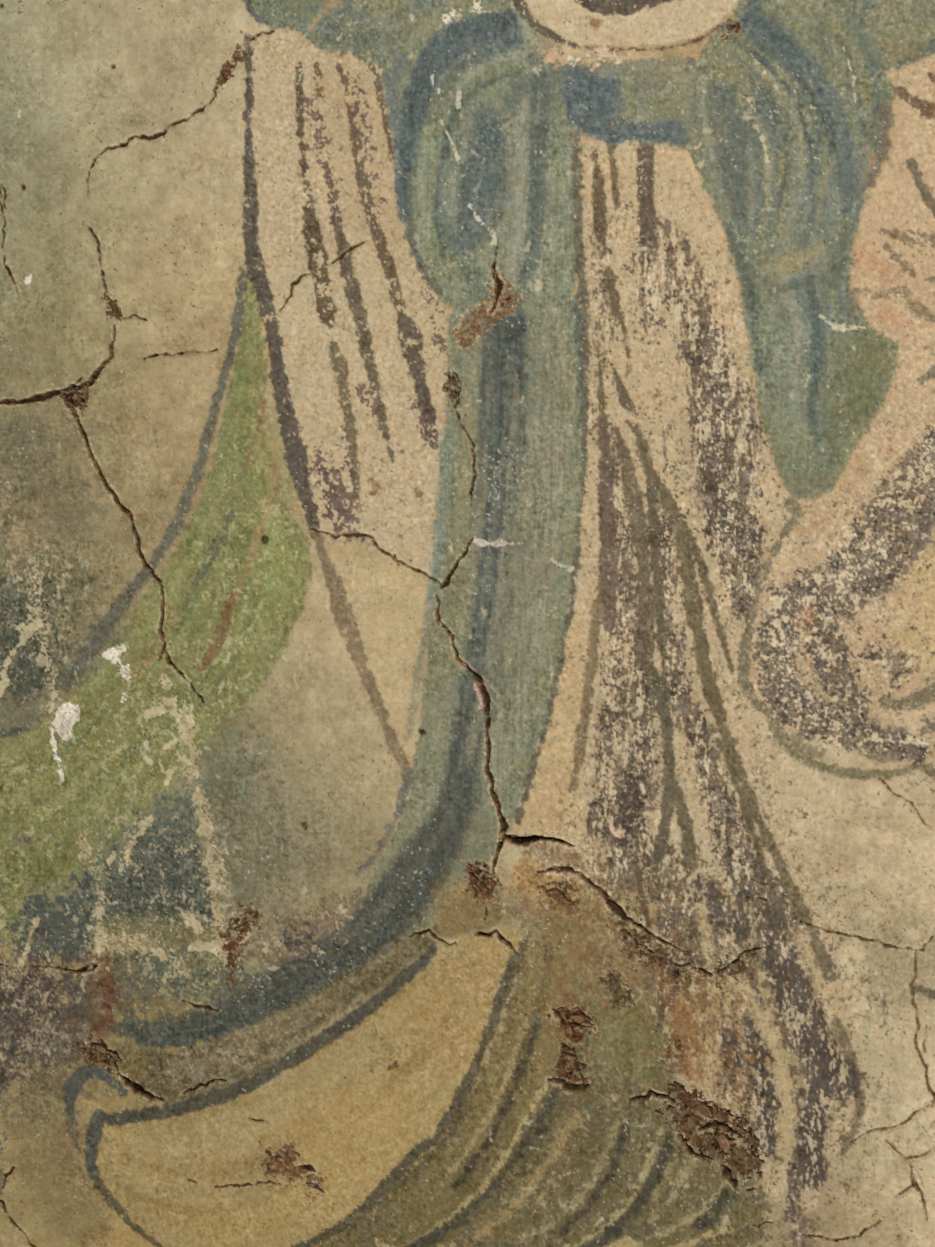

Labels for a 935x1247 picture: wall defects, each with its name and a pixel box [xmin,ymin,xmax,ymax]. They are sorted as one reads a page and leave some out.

crack [237,29,276,51]
spalling [452,269,524,353]
crack [0,87,219,706]
crack [454,410,477,508]
peeling [0,489,82,782]
peeling [79,618,267,990]
crack [310,528,769,978]
crack [880,778,933,830]
spalling [254,1137,327,1203]
spalling [545,1004,599,1094]
spalling [629,1030,773,1194]
crack [799,921,935,1244]